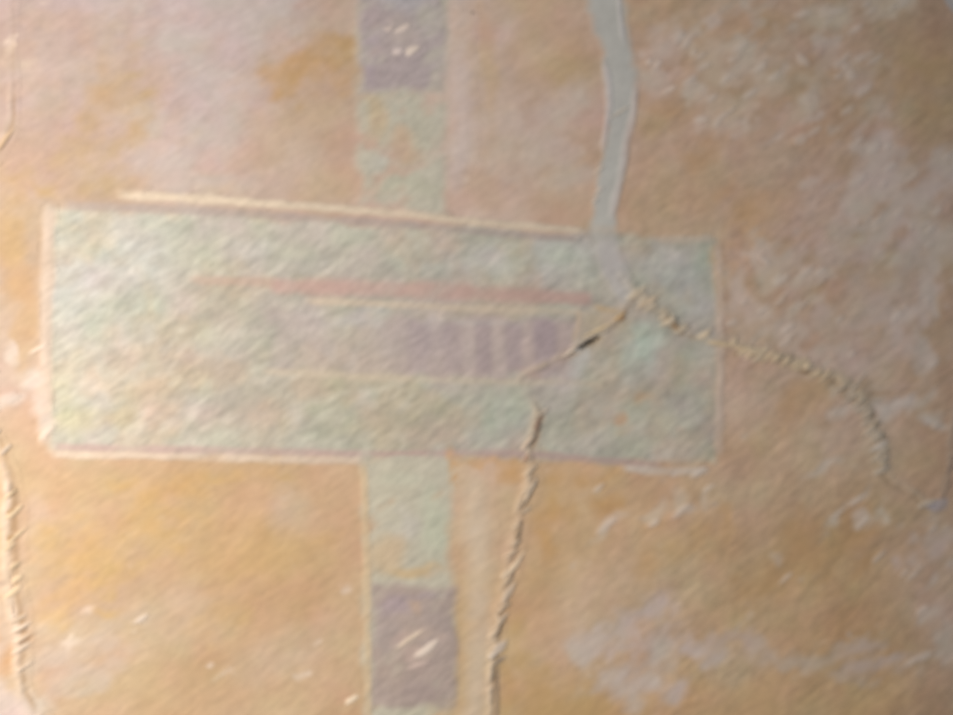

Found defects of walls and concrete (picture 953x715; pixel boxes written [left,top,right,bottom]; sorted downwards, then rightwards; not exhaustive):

crack [480,0,953,715]